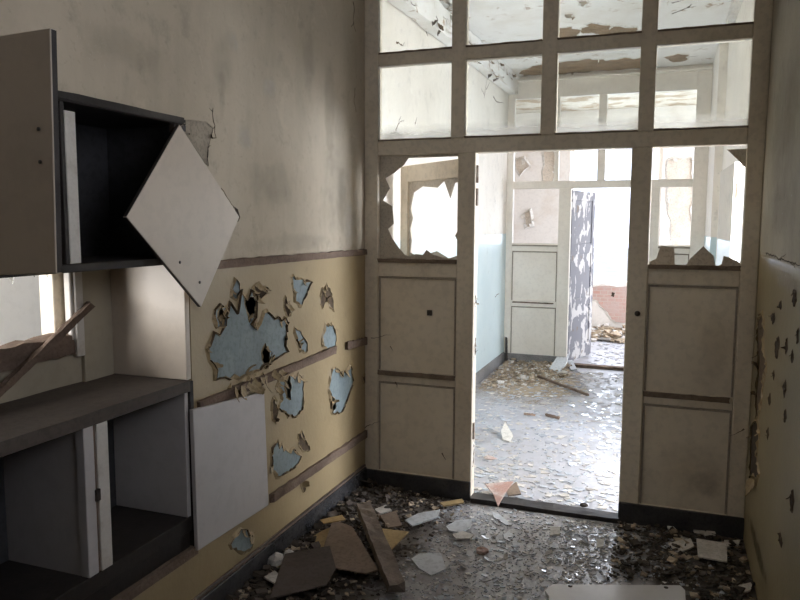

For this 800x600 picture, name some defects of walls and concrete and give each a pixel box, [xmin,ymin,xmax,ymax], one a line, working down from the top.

peeling [559,0,642,38]
peeling [488,60,542,80]
peeling [558,57,641,75]
peeling [656,53,690,66]
spalling [181,120,214,166]
peeling [515,156,531,177]
peeling [320,282,335,312]
spalling [592,283,627,326]
peeling [205,274,313,424]
peeling [328,364,365,415]
peeling [745,301,799,496]
peeling [270,430,310,480]